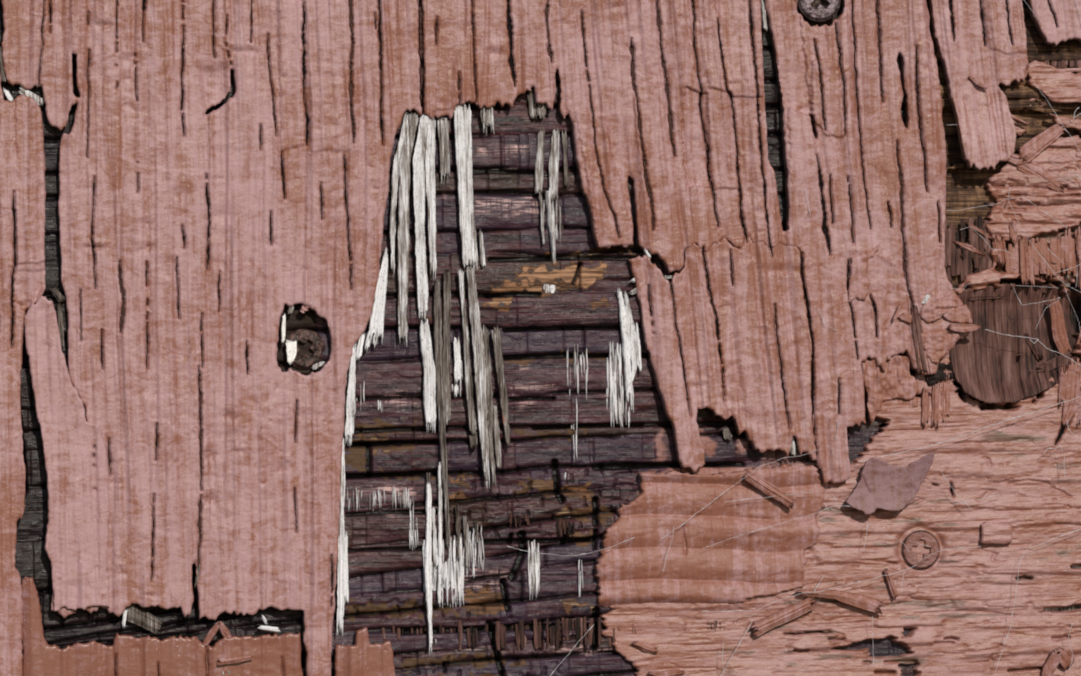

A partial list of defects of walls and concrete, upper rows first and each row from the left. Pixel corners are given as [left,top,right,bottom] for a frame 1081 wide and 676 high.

crack [9,198,17,345]
crack [80,52,148,365]
crack [176,175,220,566]
crack [213,0,285,244]
peeling [315,316,330,372]
crack [320,0,383,283]
crack [630,38,655,229]
crack [657,0,675,157]
peeling [331,6,1081,676]
crack [692,0,773,400]
crack [774,254,840,435]
crack [814,0,940,360]